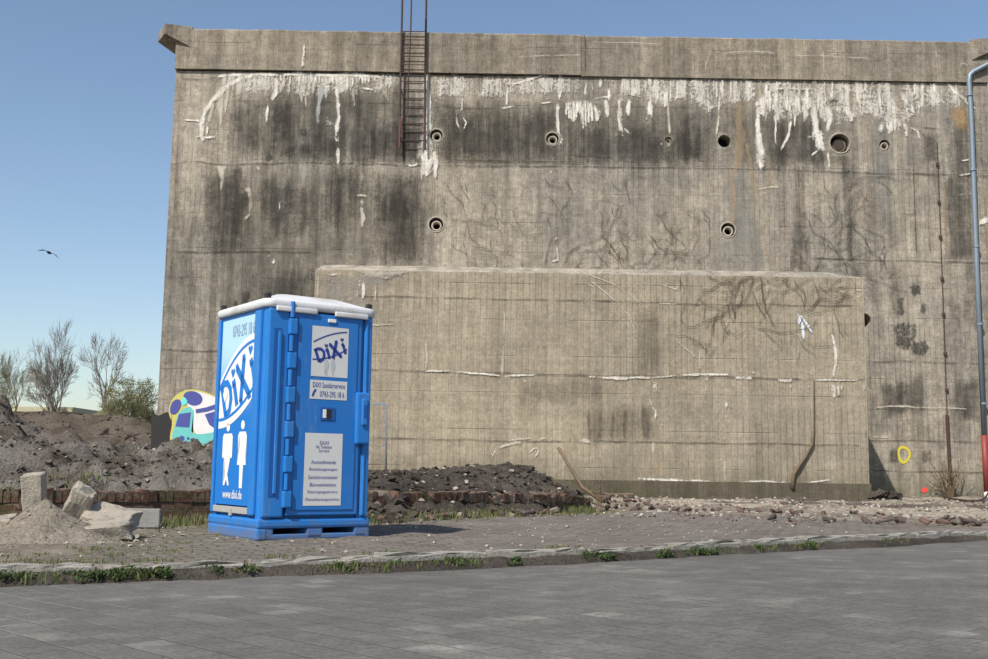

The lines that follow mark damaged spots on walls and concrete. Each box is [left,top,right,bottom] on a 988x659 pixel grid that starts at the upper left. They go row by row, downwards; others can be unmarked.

damp [183,46,976,179]
damp [210,165,251,243]
damp [895,298,928,355]